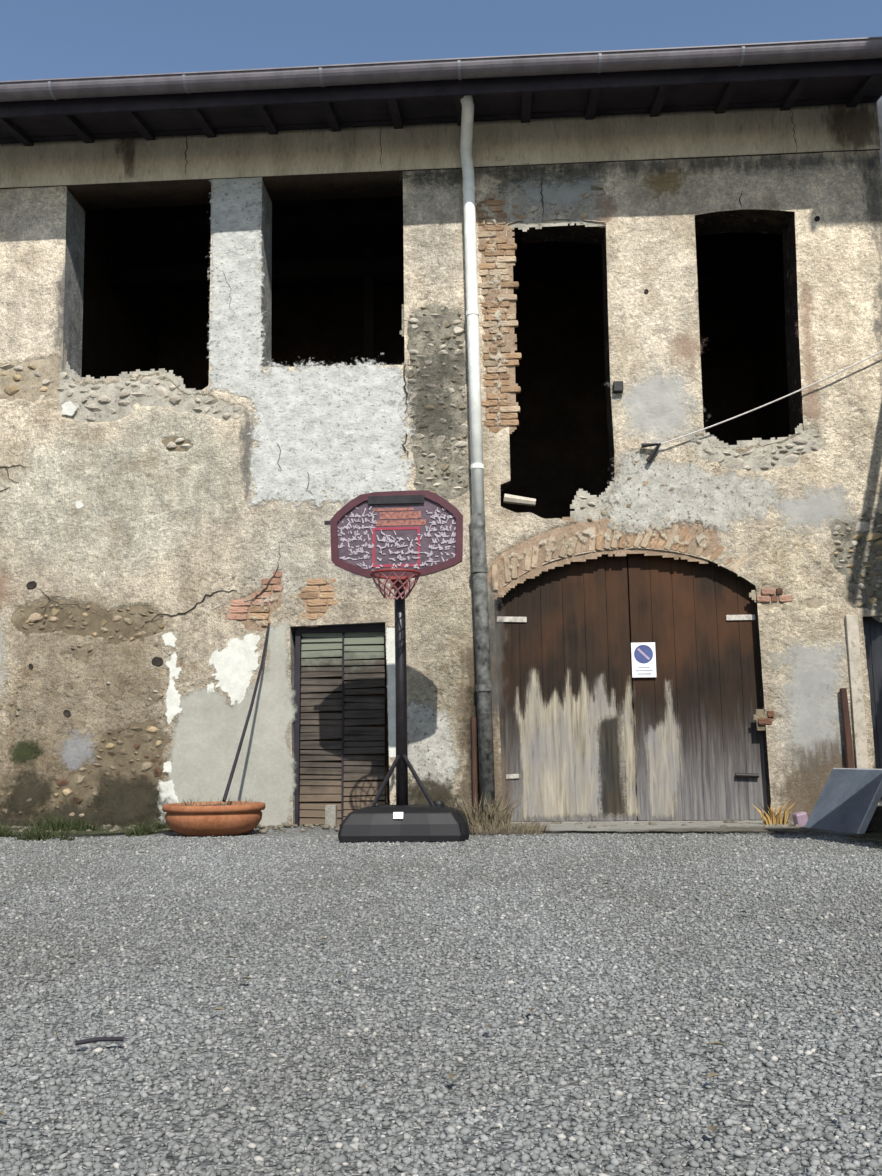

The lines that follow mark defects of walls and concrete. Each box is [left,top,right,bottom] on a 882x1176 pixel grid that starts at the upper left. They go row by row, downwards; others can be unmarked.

damp [415,163,573,180]
damp [690,156,821,170]
damp [832,106,882,227]
flaking render [475,168,609,434]
flaking render [0,344,244,424]
flaking render [400,302,471,500]
flaking render [692,423,825,473]
crack [151,546,280,620]
peeling [207,571,284,705]
flaking render [487,451,747,600]
flaking render [829,510,882,622]
flaking render [1,581,182,823]